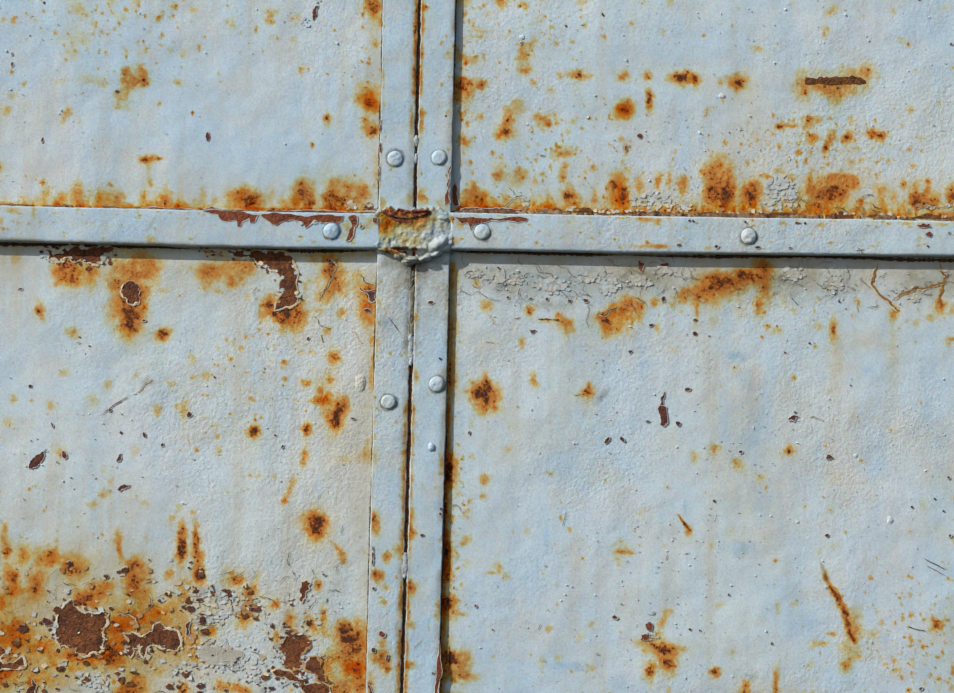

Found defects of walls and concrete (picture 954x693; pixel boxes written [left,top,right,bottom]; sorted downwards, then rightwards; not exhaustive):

rust [708,171,756,210]
rust [114,279,143,332]
peeling [198,247,303,315]
rust [263,301,301,323]
crack [447,251,954,393]
rust [698,264,767,298]
rust [444,458,453,482]
rust [177,527,200,581]
peeling [0,560,334,693]
rust [829,586,855,642]
rust [333,623,372,693]
rust [653,644,676,667]